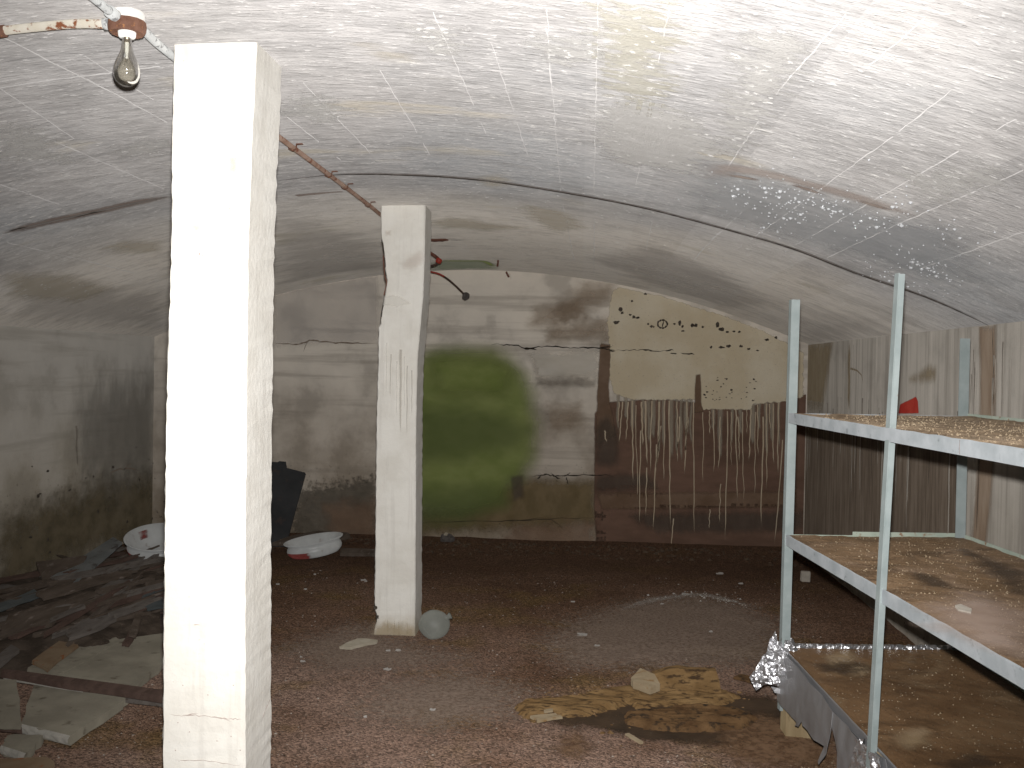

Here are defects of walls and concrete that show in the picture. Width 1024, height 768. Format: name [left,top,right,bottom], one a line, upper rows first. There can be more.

crack [276,340,367,349]
crack [492,344,693,355]
damp [422,344,957,546]
damp [0,459,154,578]